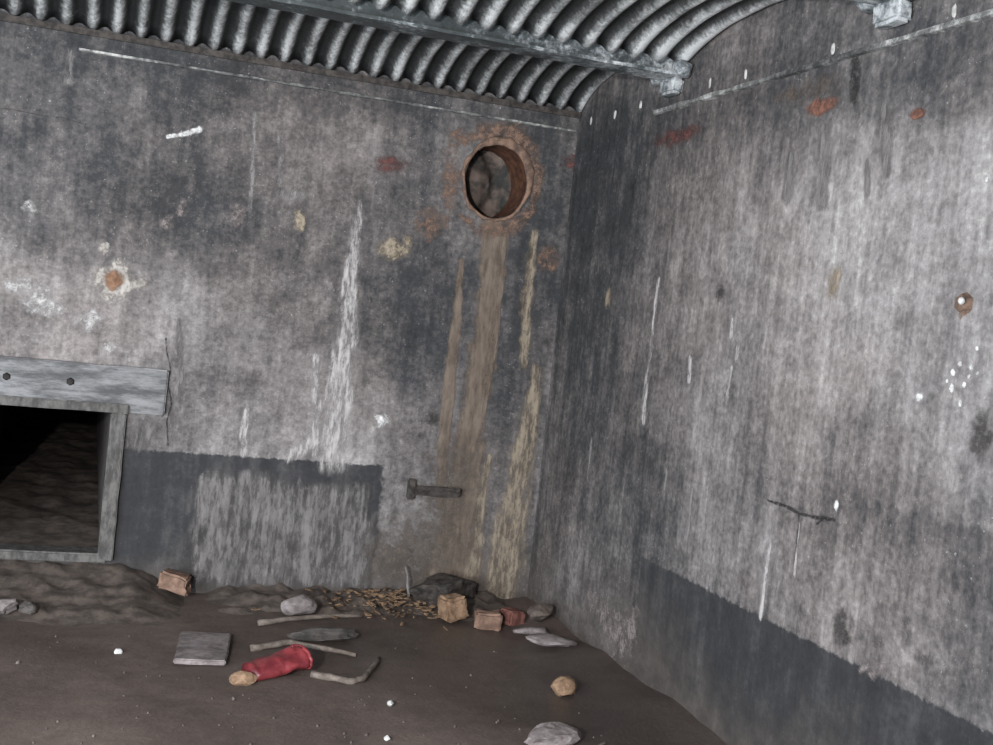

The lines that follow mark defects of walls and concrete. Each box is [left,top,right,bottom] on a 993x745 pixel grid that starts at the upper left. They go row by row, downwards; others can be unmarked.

corrosion [105,270,123,291]
efflorescence [286,202,362,470]
corrosion [416,123,556,599]
efflorescence [239,405,249,456]
leakage [759,528,771,620]
leakage [834,609,849,644]